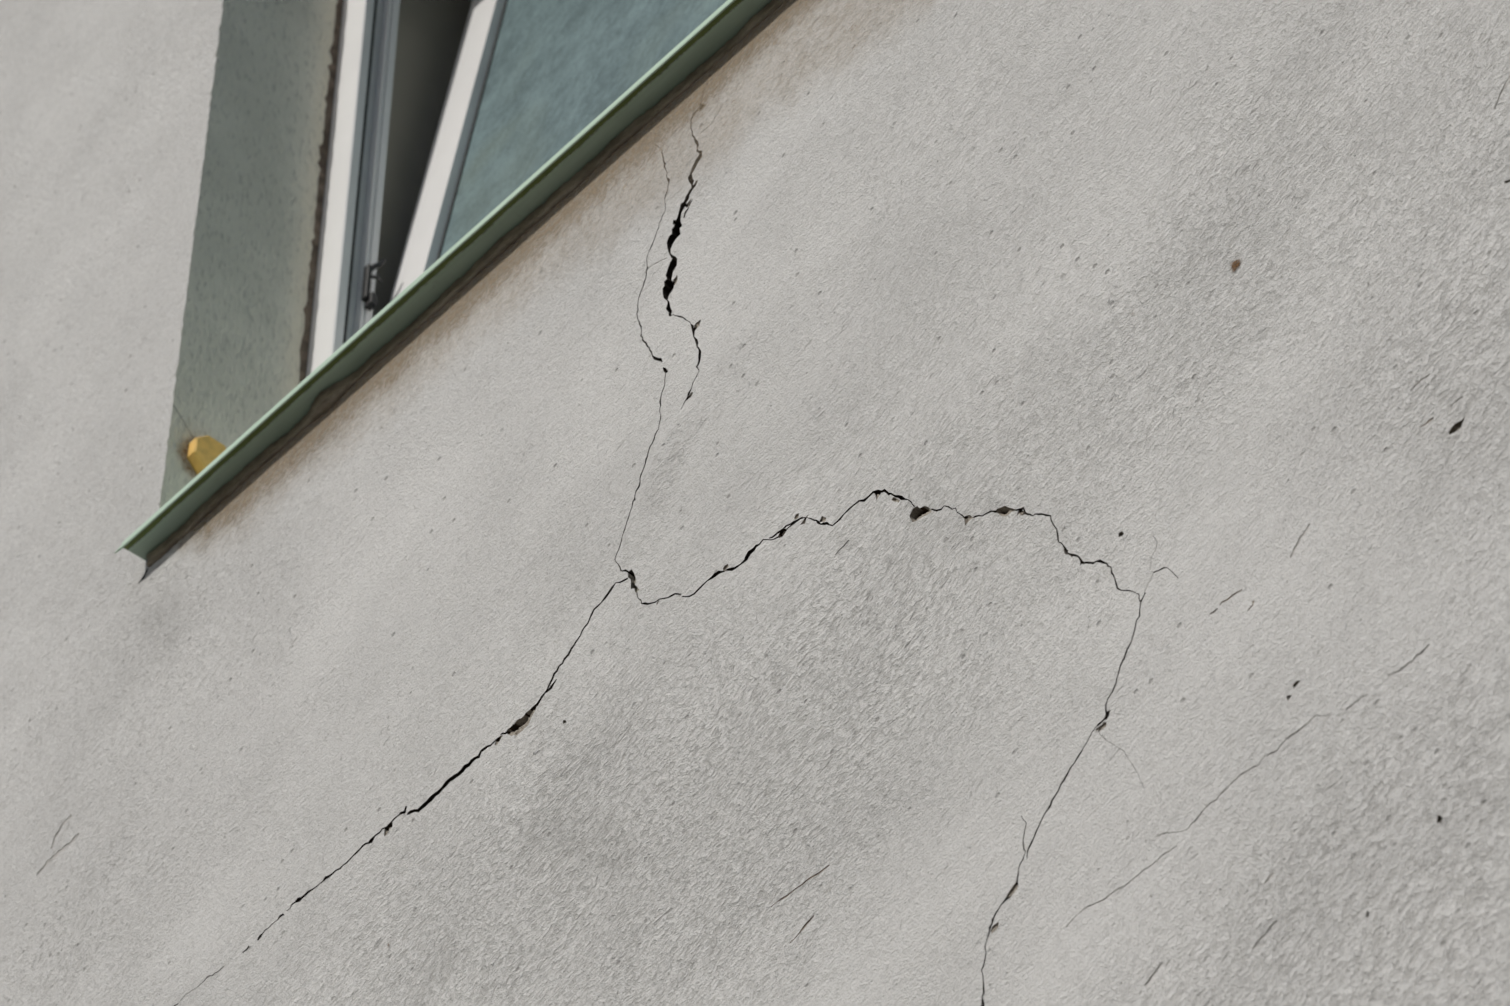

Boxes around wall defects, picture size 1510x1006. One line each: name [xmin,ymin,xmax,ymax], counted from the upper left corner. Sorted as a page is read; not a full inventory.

crack [174,90,1179,1006]